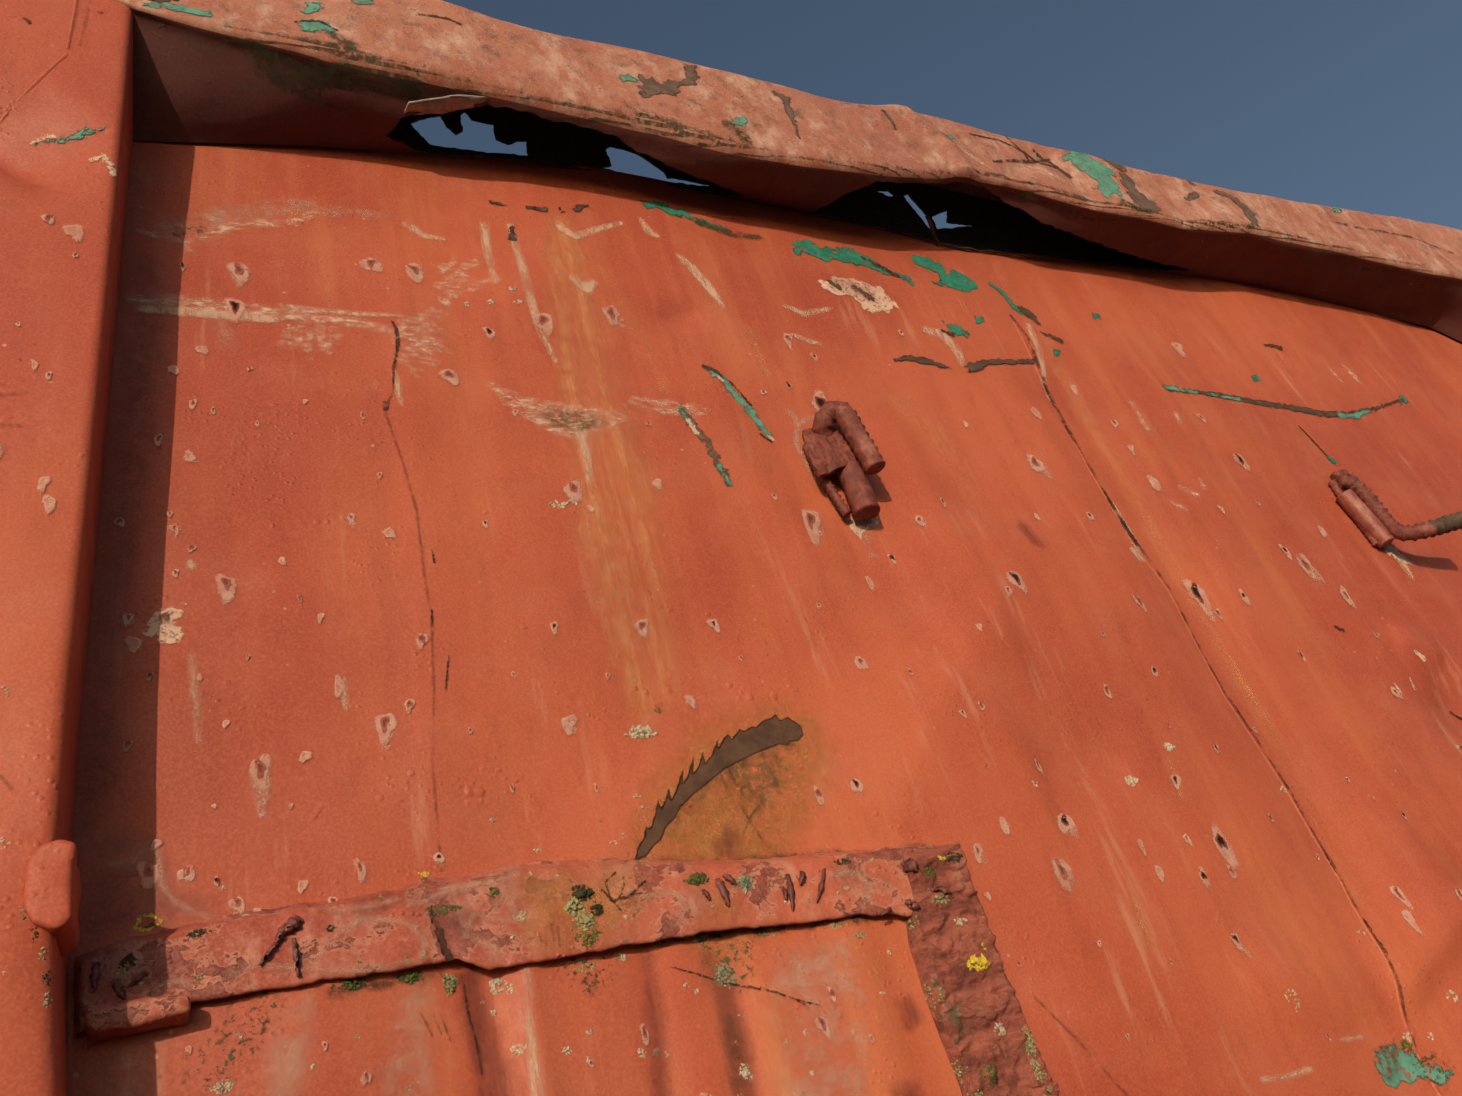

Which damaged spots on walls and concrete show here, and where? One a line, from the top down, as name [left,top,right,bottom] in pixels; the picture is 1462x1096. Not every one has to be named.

peeling [618,64,700,98]
peeling [1033,149,1162,212]
peeling [641,200,761,239]
peeling [792,239,1040,325]
crack [383,320,401,410]
crack [431,609,449,688]
crack [894,314,1416,1046]
corrosion [636,718,826,910]
corrosion [900,858,918,873]
corrosion [881,886,952,916]
corrosion [259,915,304,977]
peeling [1372,1042,1454,1089]